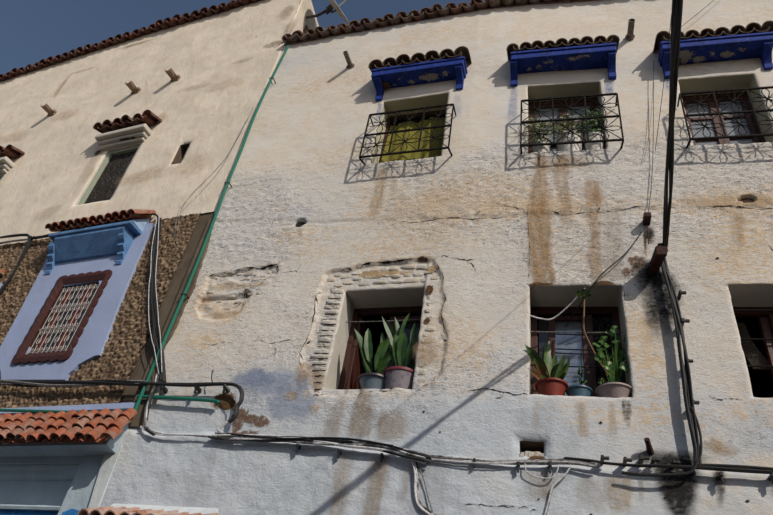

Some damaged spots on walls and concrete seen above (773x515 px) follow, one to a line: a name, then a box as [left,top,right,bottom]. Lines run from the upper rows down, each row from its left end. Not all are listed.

rust [528,158,554,286]
spalling [205,264,278,310]
spalling [300,256,448,395]
leakage [641,273,677,326]
leakage [655,458,697,515]